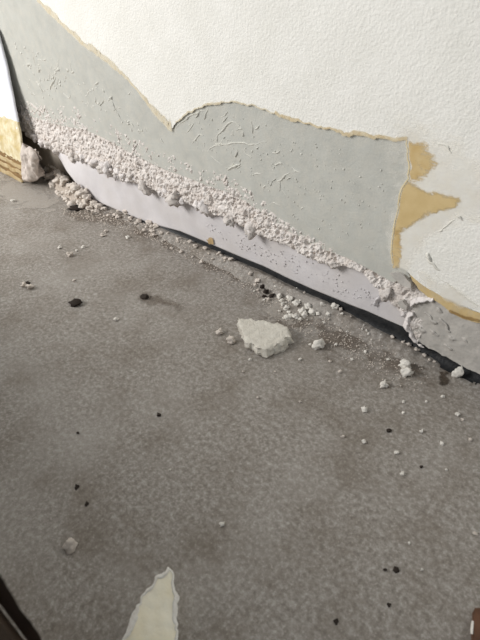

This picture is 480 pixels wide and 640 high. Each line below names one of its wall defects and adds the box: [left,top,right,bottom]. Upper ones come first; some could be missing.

peeling [0,0,456,342]
flaking render [451,366,464,378]